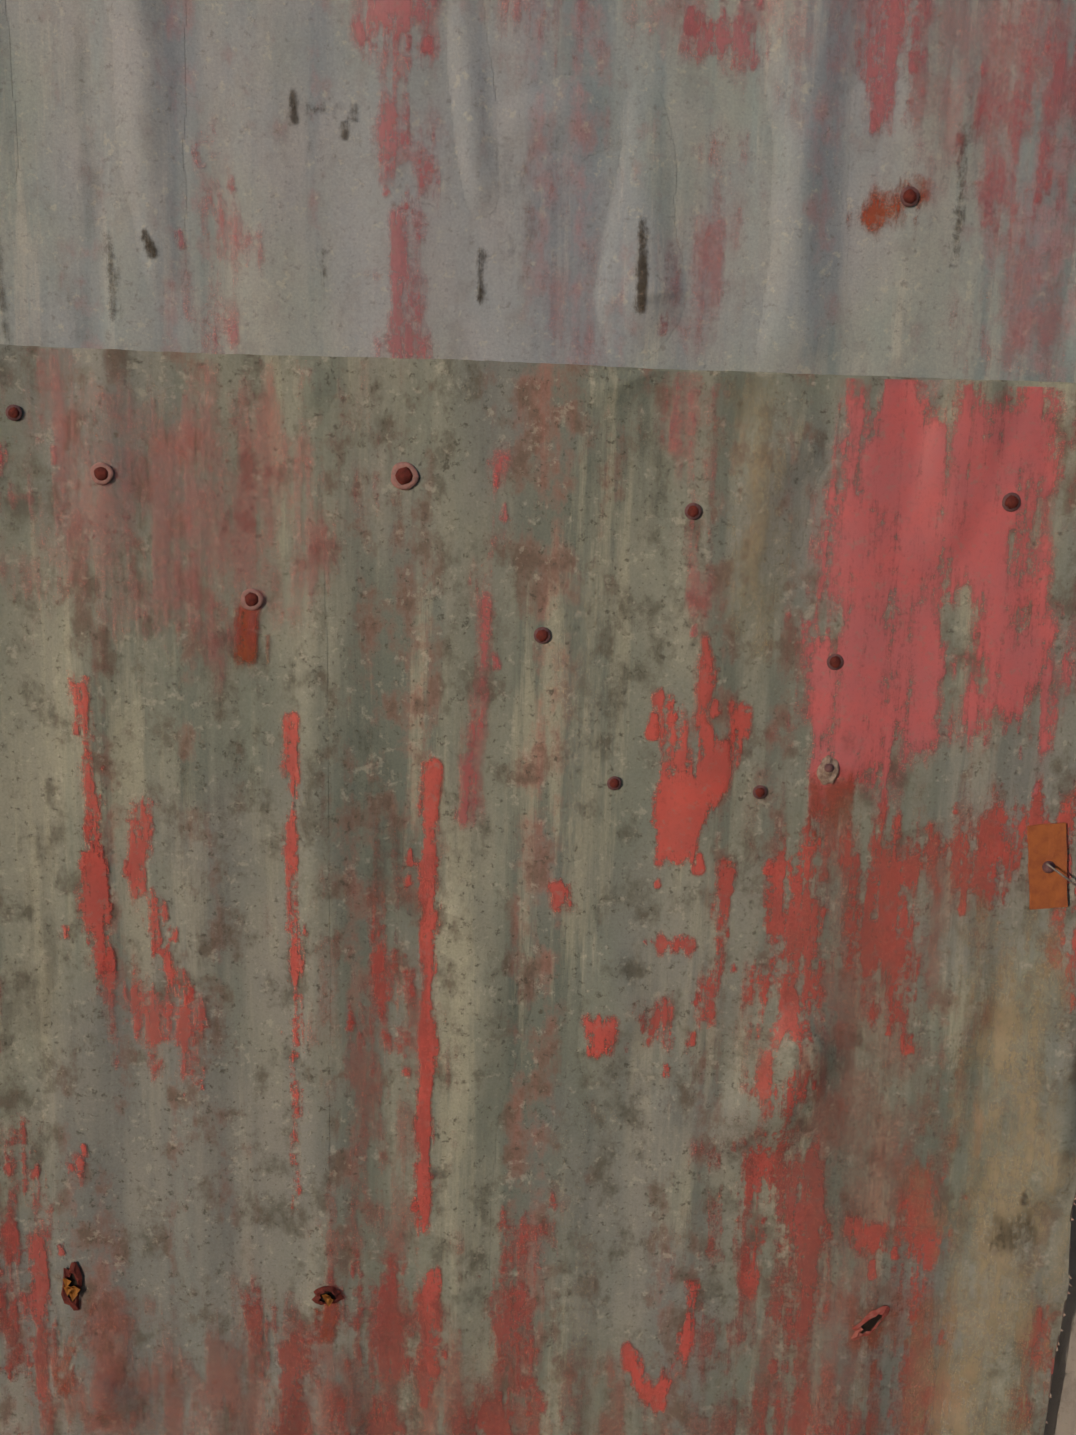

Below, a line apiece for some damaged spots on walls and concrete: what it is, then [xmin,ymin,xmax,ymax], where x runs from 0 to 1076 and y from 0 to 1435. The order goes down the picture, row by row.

rust [860,181,928,231]
rust [234,606,268,663]
peeling [621,379,1076,1435]
peeling [583,1014,618,1059]
rust [63,1278,80,1301]